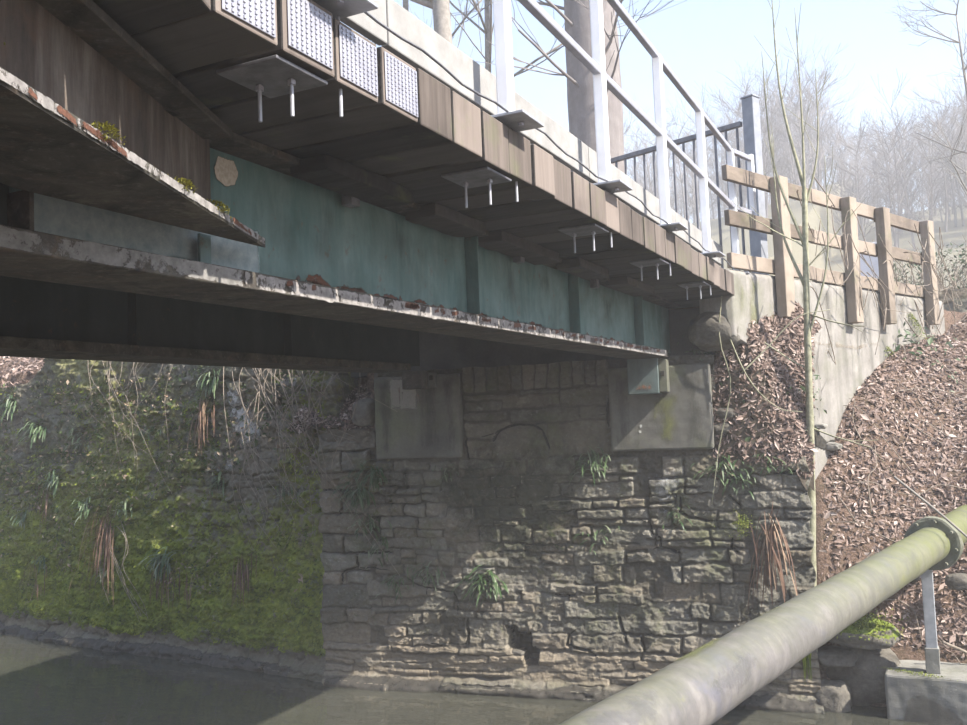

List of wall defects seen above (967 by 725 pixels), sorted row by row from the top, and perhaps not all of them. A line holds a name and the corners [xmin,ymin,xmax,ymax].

peeling [0,67,65,118]
rust [57,105,128,158]
peeling [77,119,265,244]
peeling [0,225,667,356]
rust [286,274,459,316]
rust [479,313,542,330]
crack [640,519,681,553]
crack [566,628,600,659]